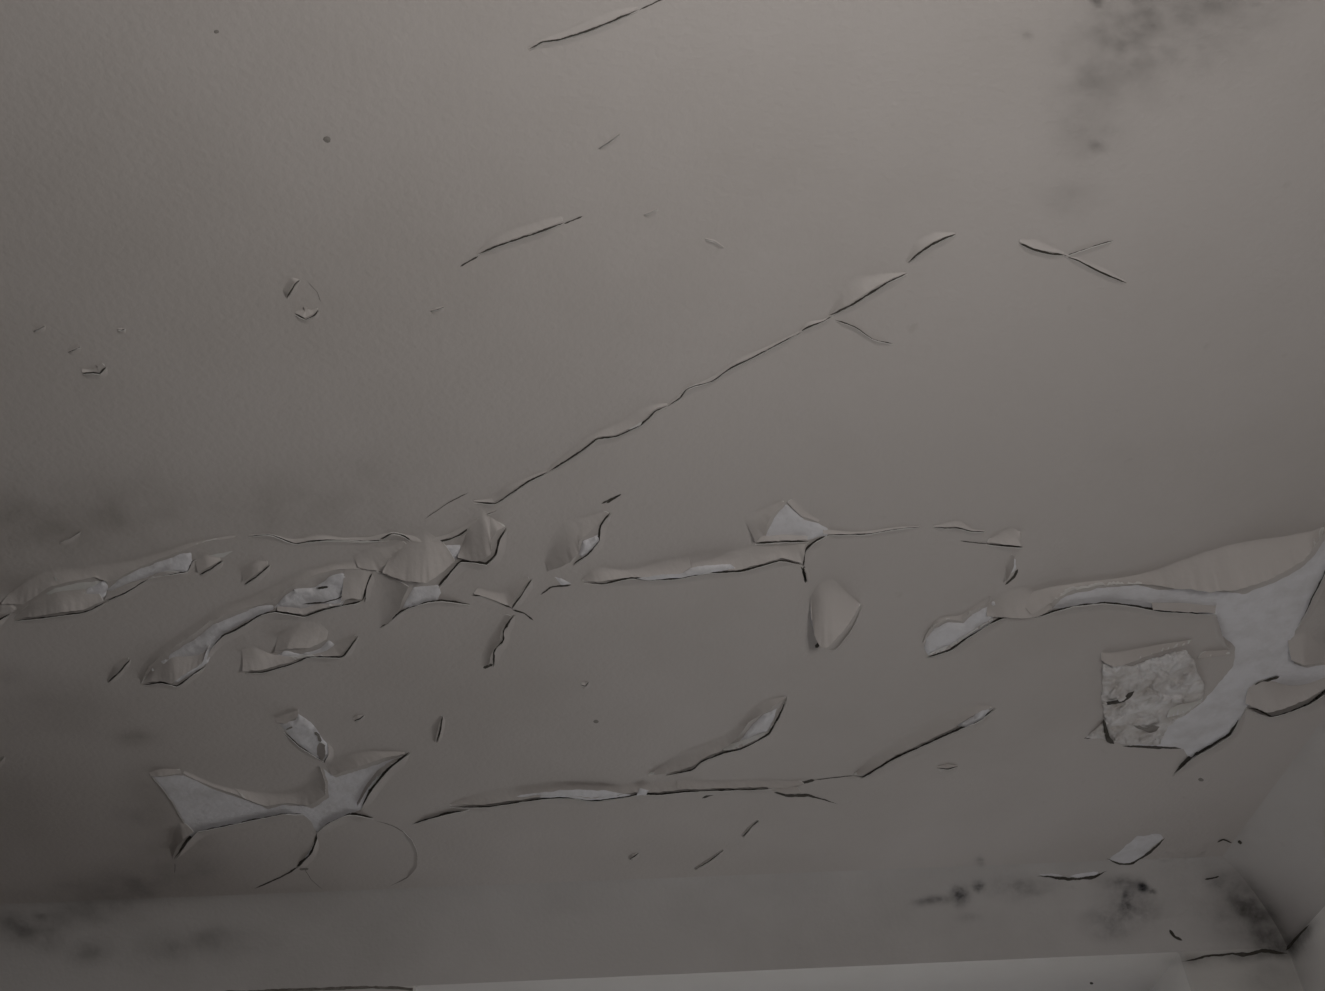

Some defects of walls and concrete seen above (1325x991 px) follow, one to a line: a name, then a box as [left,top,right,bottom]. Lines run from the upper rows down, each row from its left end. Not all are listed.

crack [425,231,957,519]
peeling [0,535,235,627]
peeling [136,508,508,690]
peeling [542,495,862,652]
peeling [923,523,1325,776]
peeling [149,710,410,888]
peeling [414,696,996,825]
peeling [1108,834,1165,865]